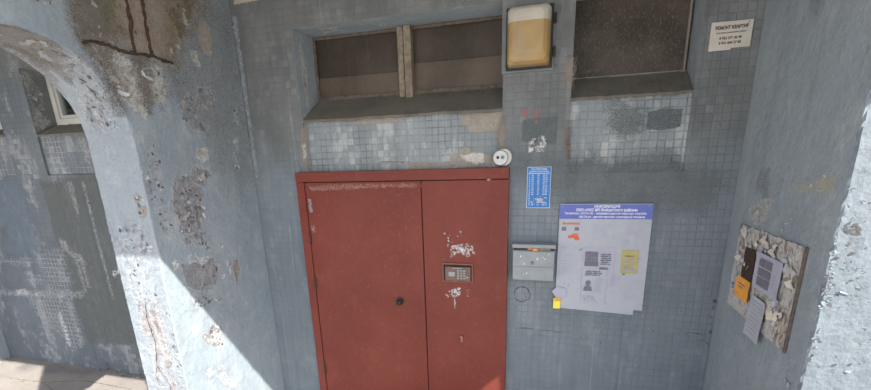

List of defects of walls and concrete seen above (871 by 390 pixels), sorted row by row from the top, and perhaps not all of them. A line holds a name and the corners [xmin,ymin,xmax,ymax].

damp [0,0,158,118]
peeling [107,141,241,317]
peeling [200,324,224,349]